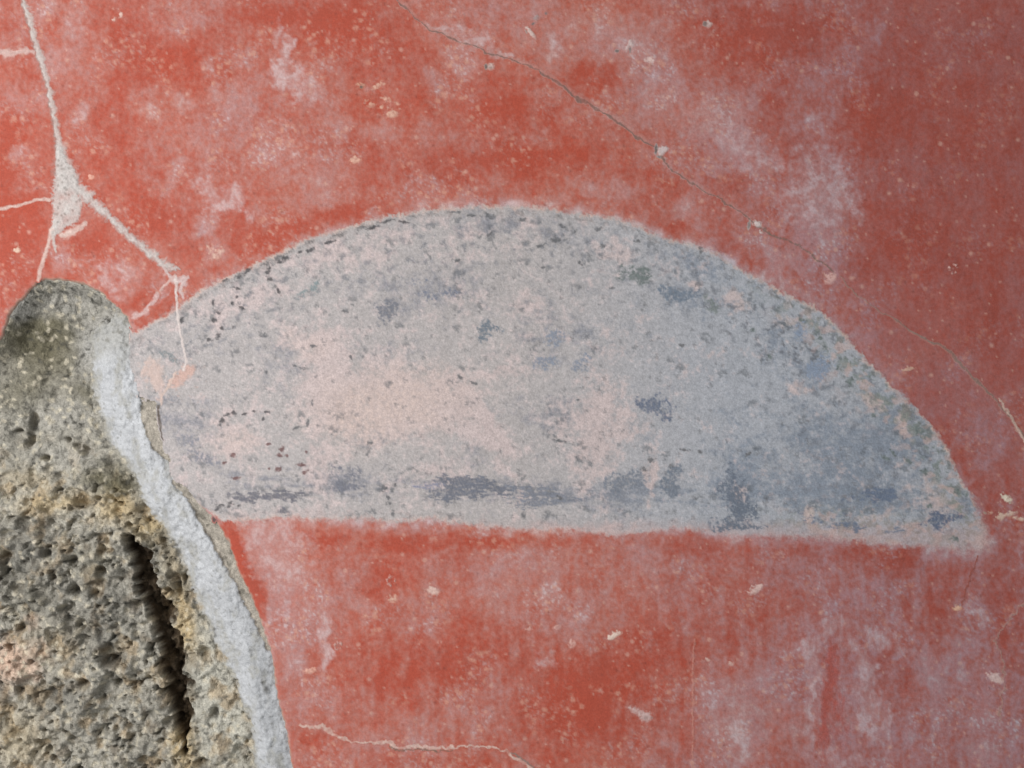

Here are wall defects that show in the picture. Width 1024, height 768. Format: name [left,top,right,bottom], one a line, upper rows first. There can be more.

crack [0,0,190,442]
crack [396,0,1024,444]
peeling [0,202,1024,768]